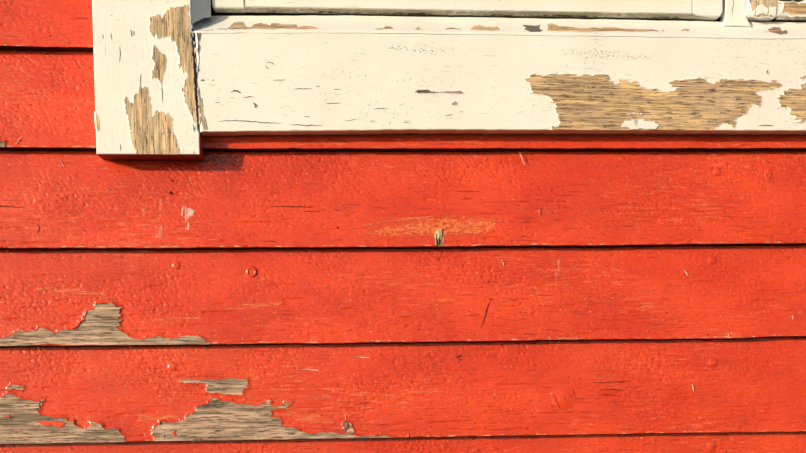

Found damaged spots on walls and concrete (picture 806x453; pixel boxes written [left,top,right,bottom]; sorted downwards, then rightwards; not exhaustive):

peeling [748,0,806,36]
peeling [123,3,208,154]
peeling [524,68,806,130]
peeling [0,299,211,346]
peeling [0,382,127,444]
peeling [149,375,410,441]